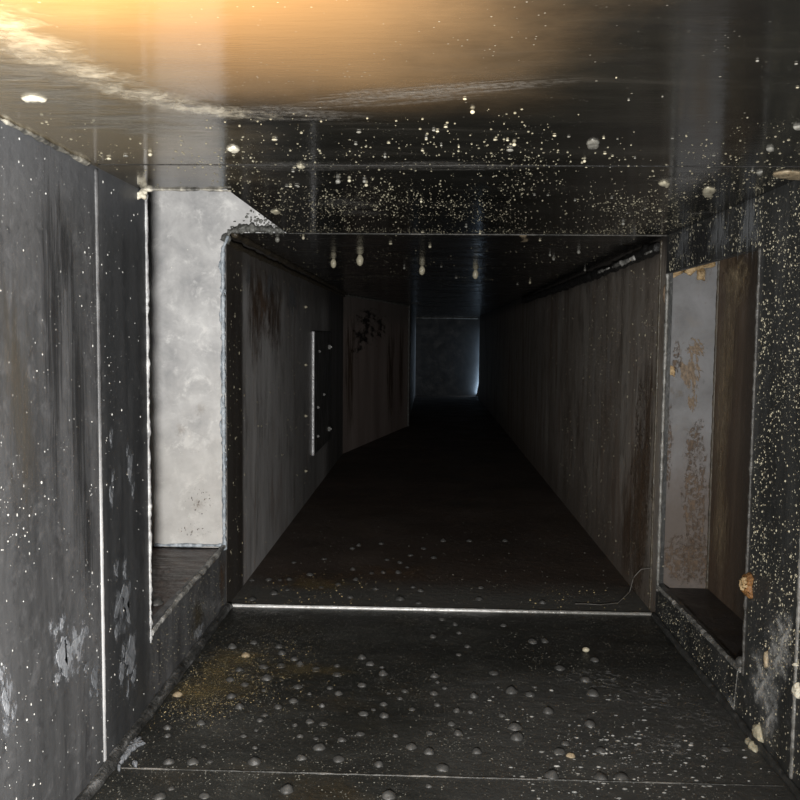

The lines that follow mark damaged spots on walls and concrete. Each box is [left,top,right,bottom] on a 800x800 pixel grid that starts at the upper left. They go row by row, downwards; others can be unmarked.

corrosion [672,338,704,413]
corrosion [664,420,709,584]
peeling [48,613,100,701]
peeling [112,556,137,701]